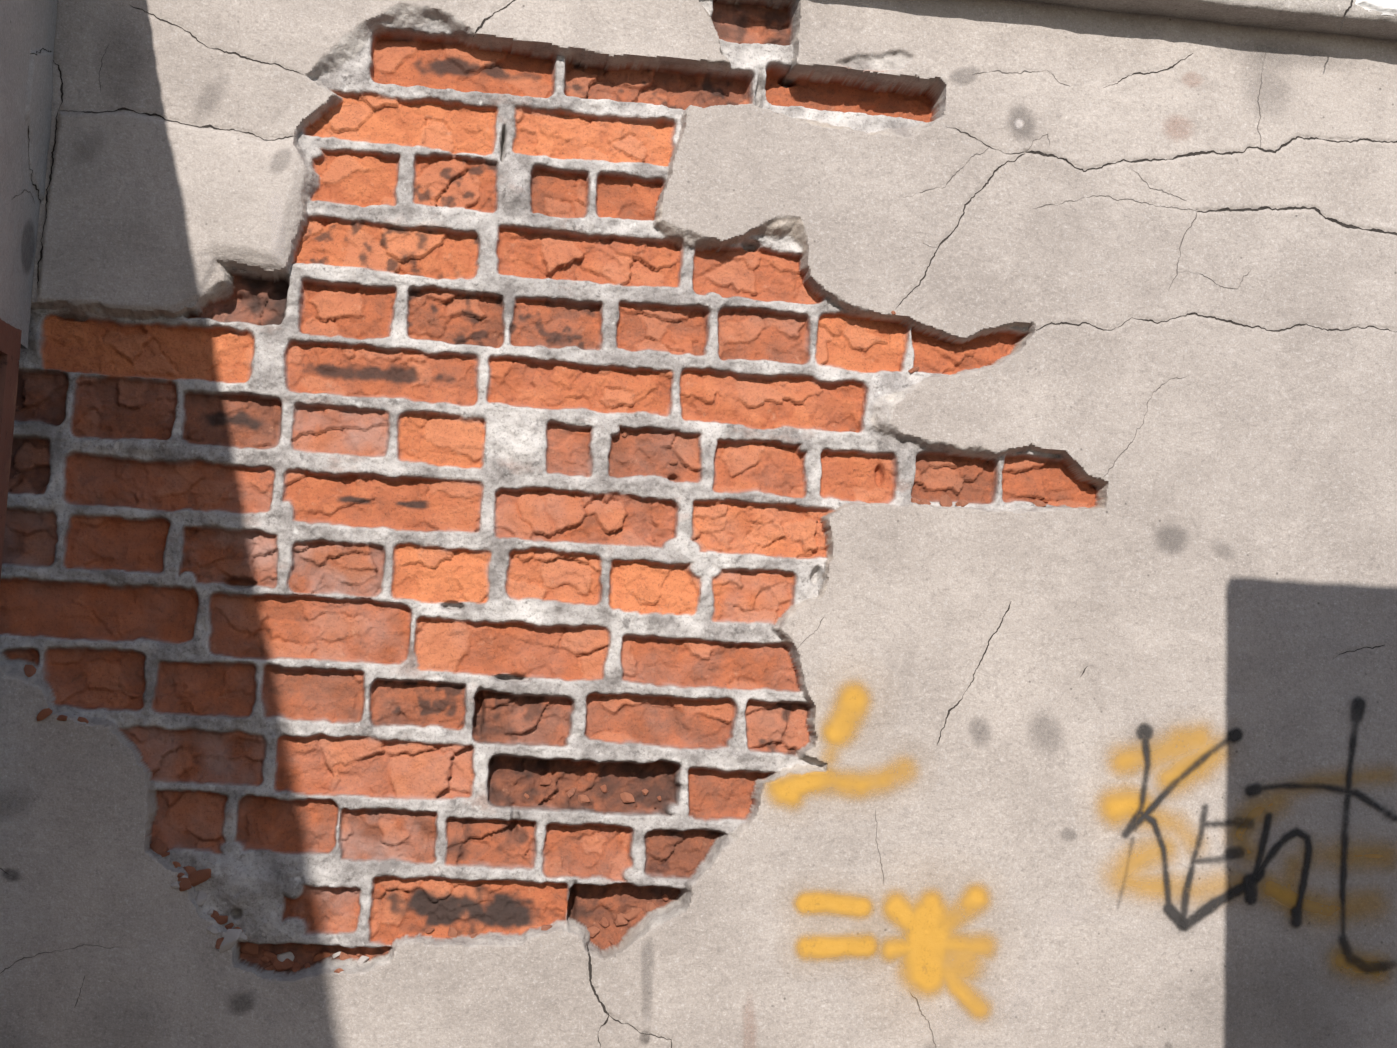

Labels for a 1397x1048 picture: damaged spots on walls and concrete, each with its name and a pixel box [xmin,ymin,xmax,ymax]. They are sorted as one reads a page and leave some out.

crack [130,5,301,74]
crack [473,0,515,37]
crack [14,46,292,291]
crack [897,49,1397,332]
crack [1102,377,1184,479]
spalling [0,0,1109,982]
crack [587,945,672,1048]